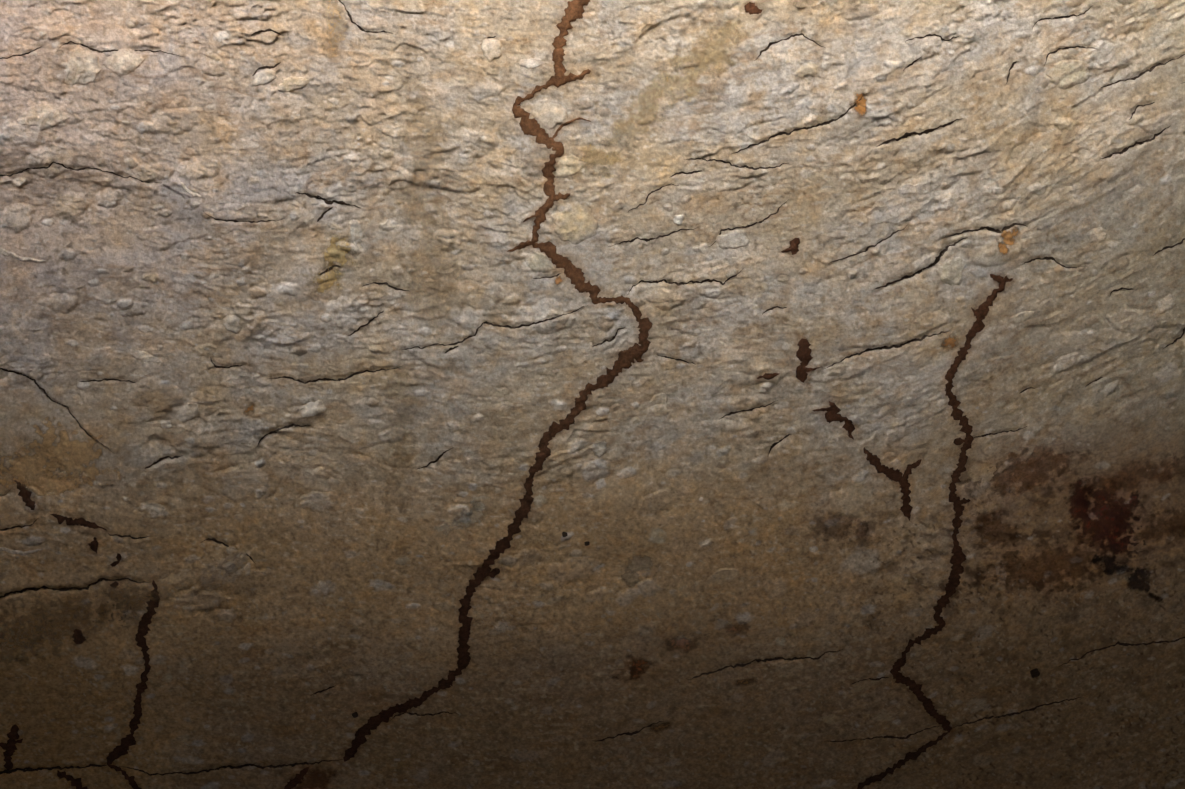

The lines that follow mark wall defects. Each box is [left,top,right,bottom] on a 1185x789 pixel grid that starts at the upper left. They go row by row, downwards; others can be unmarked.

crack [318,265,341,276]
crack [349,282,409,336]
crack [268,305,588,384]
crack [210,357,244,368]
crack [0,368,135,454]
crack [145,455,183,469]
crack [417,447,454,469]
crack [0,577,149,598]